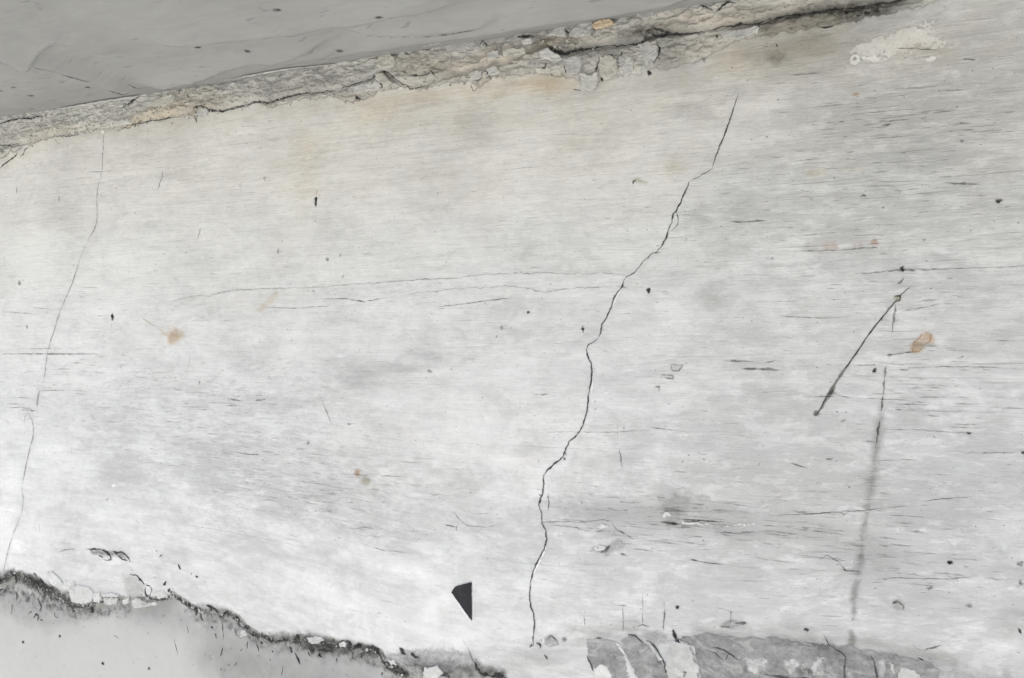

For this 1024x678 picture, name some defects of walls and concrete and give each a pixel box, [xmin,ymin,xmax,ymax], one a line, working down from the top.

peeling [521,22,593,62]
crack [413,93,739,659]
spalling [0,548,506,678]
peeling [586,621,940,678]